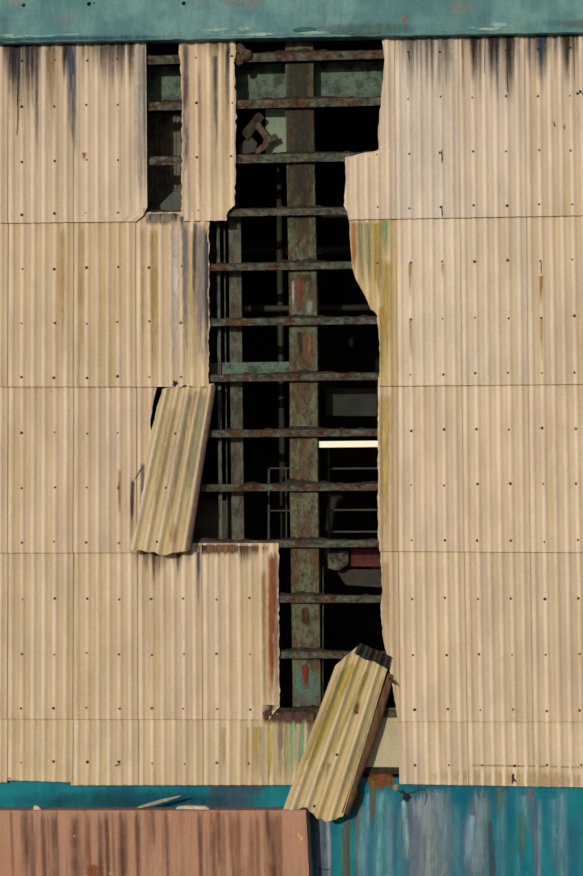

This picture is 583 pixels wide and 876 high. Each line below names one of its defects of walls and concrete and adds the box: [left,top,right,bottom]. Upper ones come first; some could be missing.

rust [235,43,252,66]
leakage [528,22,583,68]
leakage [0,36,146,171]
rust [292,275,312,313]
rust [352,220,389,341]
rust [378,397,390,505]
rust [202,544,258,556]
rust [262,554,279,681]
rust [341,787,360,876]
rust [368,774,398,814]